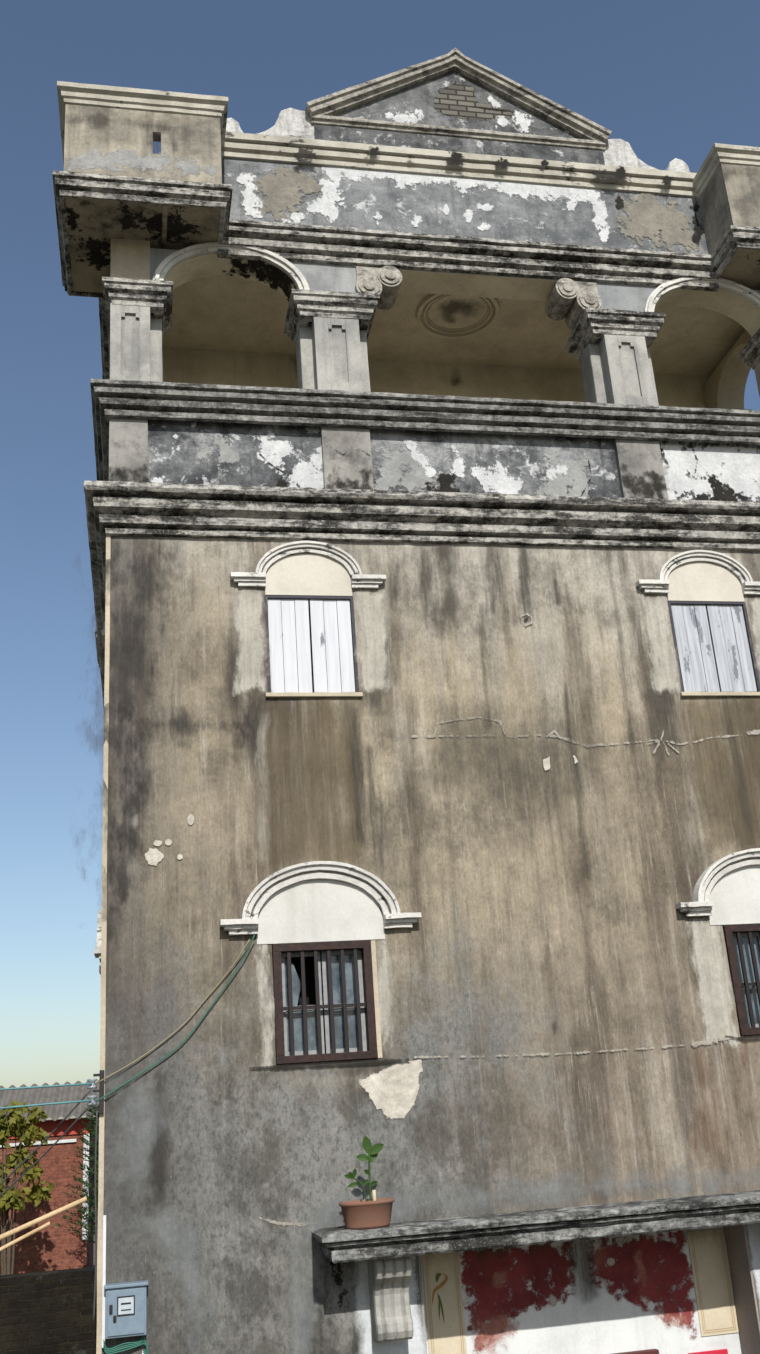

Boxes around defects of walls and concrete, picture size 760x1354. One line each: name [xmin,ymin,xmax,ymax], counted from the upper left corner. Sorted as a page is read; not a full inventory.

peeling [236,165,703,251]
peeling [252,436,324,489]
peeling [374,439,596,497]
peeling [659,441,760,502]
water stain [441,587,455,628]
water stain [520,545,529,614]
water stain [94,610,153,753]
crack [412,716,760,755]
water stain [242,702,375,865]
spalling [358,1059,423,1120]
water stain [127,1084,199,1301]
peeling [460,1230,697,1351]